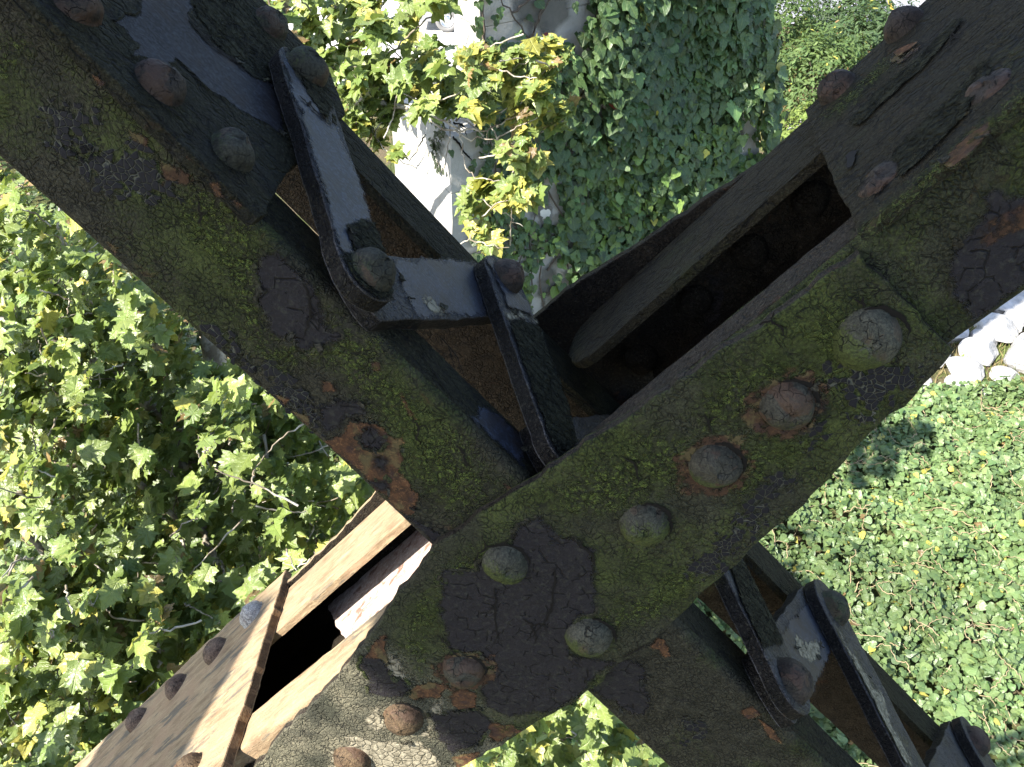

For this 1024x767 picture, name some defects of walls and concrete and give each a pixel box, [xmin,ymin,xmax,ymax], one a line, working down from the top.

peeling [945,190,1024,321]
rust [324,420,418,516]
rust [672,367,832,497]
rust [406,652,498,714]
peeling [330,514,615,767]